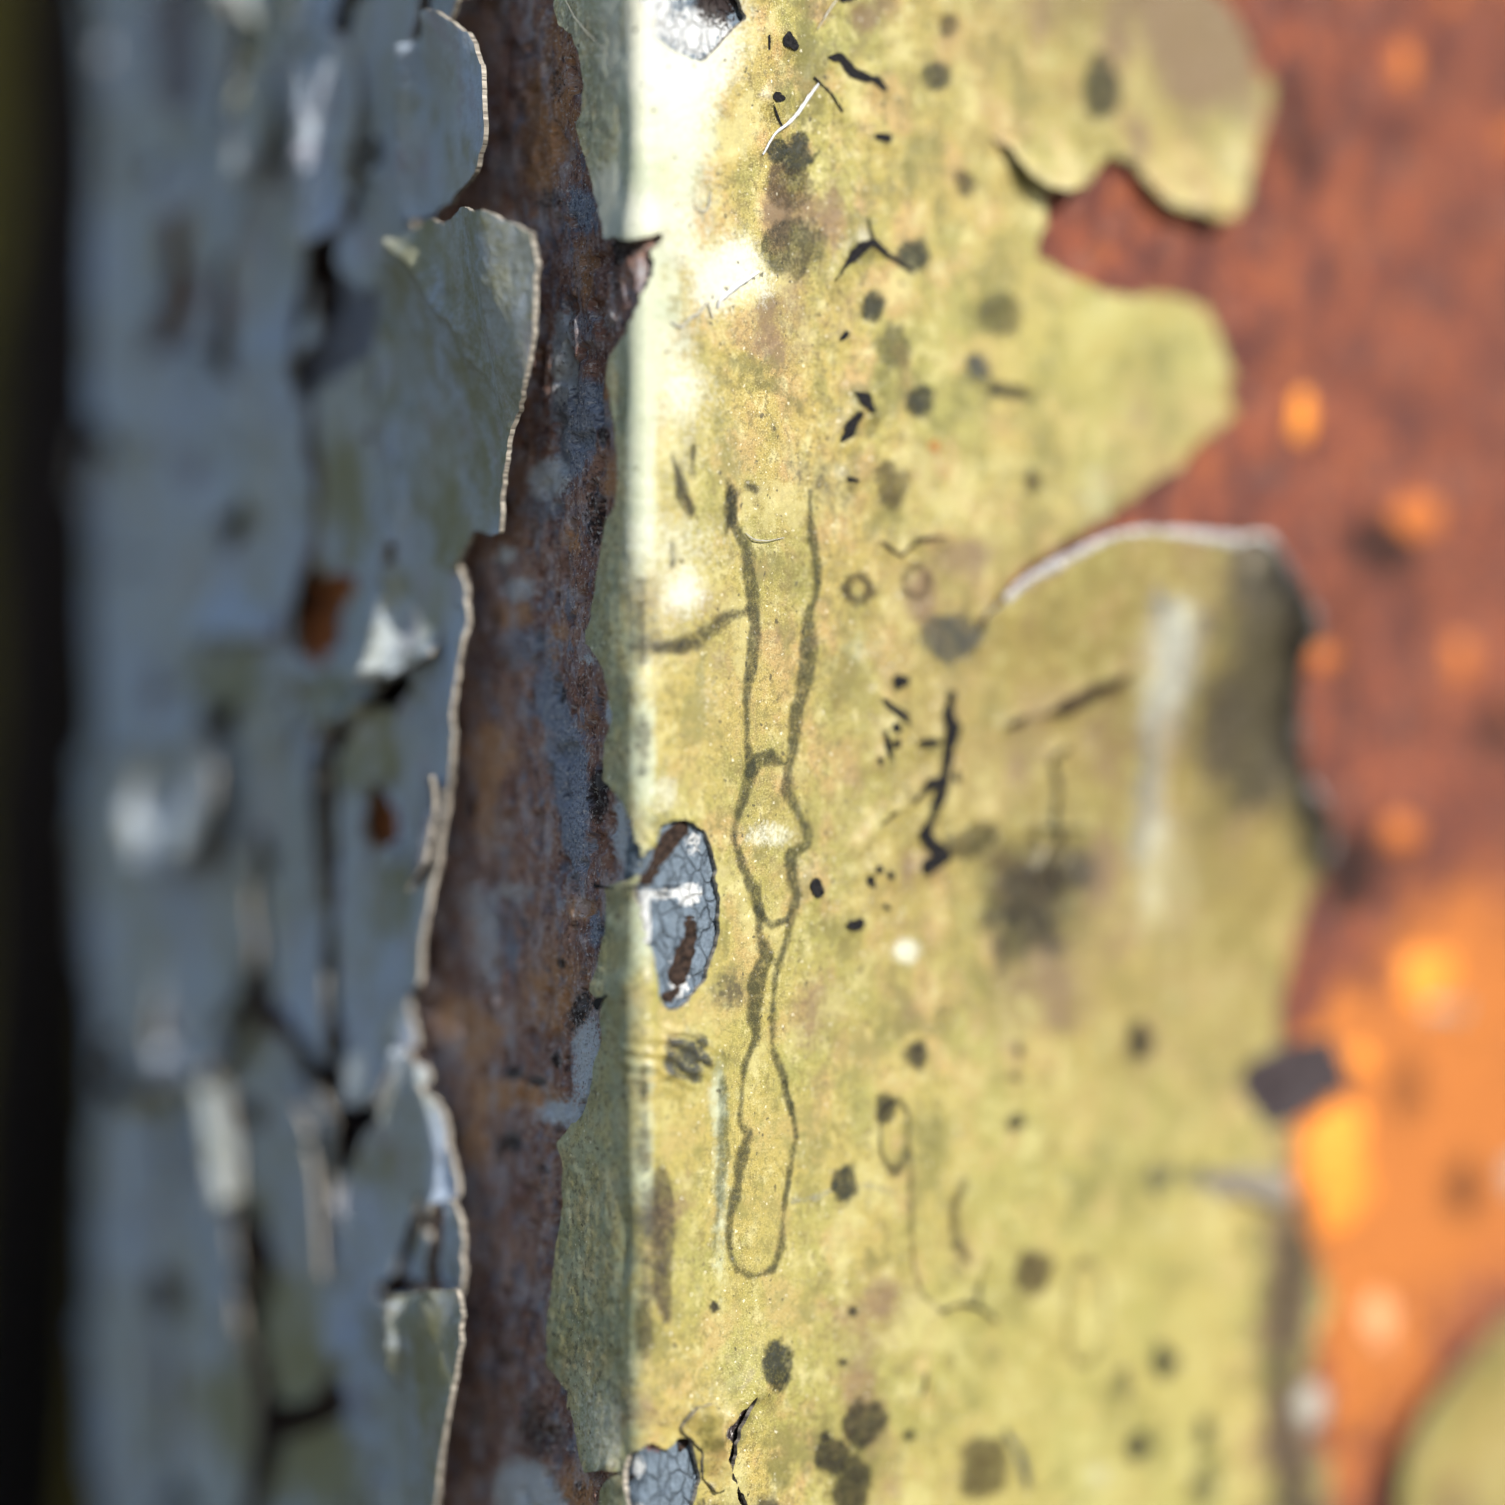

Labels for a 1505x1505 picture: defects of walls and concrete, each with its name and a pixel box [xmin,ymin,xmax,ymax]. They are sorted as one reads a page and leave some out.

peeling [201,0,363,242]
damp [762,132,821,273]
peeling [305,278,444,861]
peeling [116,661,217,874]
corrosion [358,0,659,1505]
corrosion [975,0,1505,1505]
crack [221,897,316,1077]
peeling [624,820,717,1010]
damp [718,483,821,1277]
crack [244,1202,277,1402]
crack [379,1202,490,1319]
damp [762,1341,793,1392]